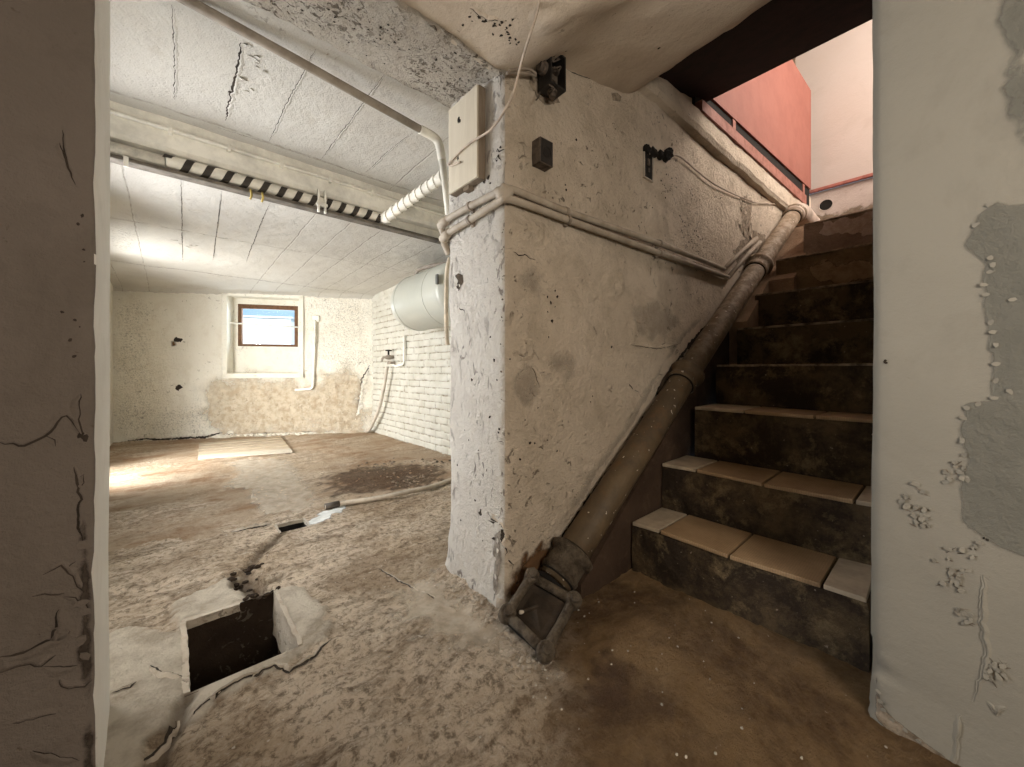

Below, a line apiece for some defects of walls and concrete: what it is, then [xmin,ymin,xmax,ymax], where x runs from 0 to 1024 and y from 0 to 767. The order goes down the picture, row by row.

crack [55,130,78,185]
crack [215,43,413,185]
peeling [998,0,1024,133]
crack [0,394,86,447]
damp [208,373,363,437]
peeling [932,202,1024,563]
crack [231,523,272,532]
damp [309,464,445,525]
crack [0,467,91,724]
crack [144,639,331,764]
crack [950,575,1007,764]